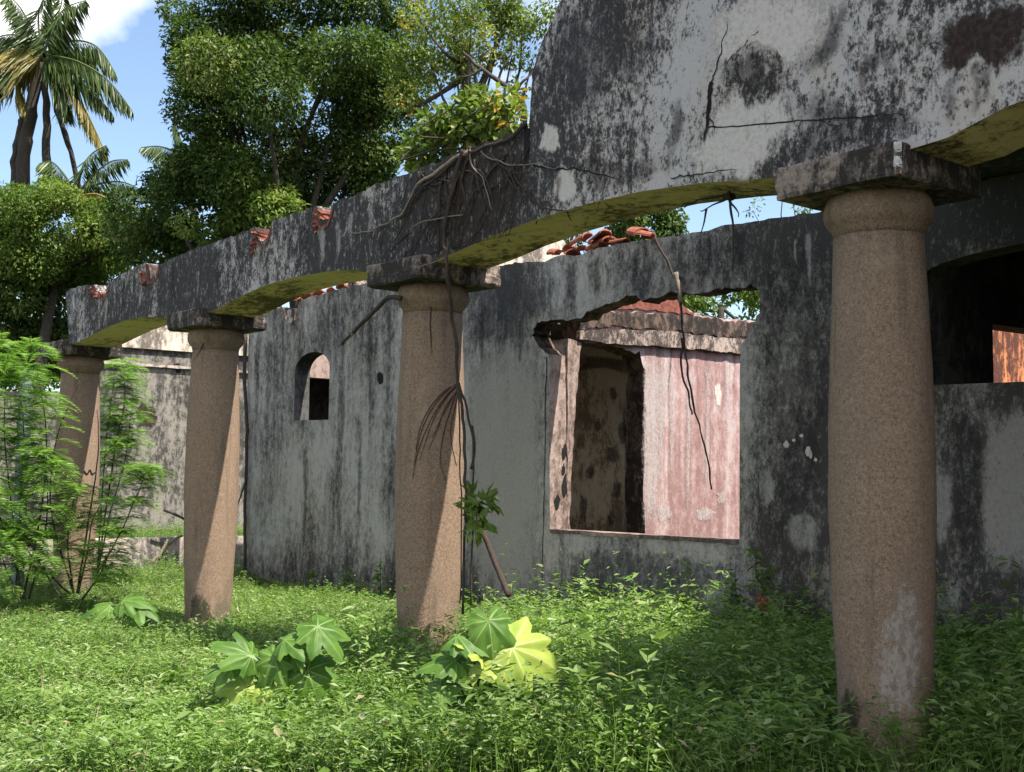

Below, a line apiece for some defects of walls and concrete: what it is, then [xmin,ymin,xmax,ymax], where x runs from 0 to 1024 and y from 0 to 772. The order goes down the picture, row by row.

damp [939,3,1024,70]
crack [670,21,902,179]
peeling [783,434,817,461]
damp [936,466,952,544]